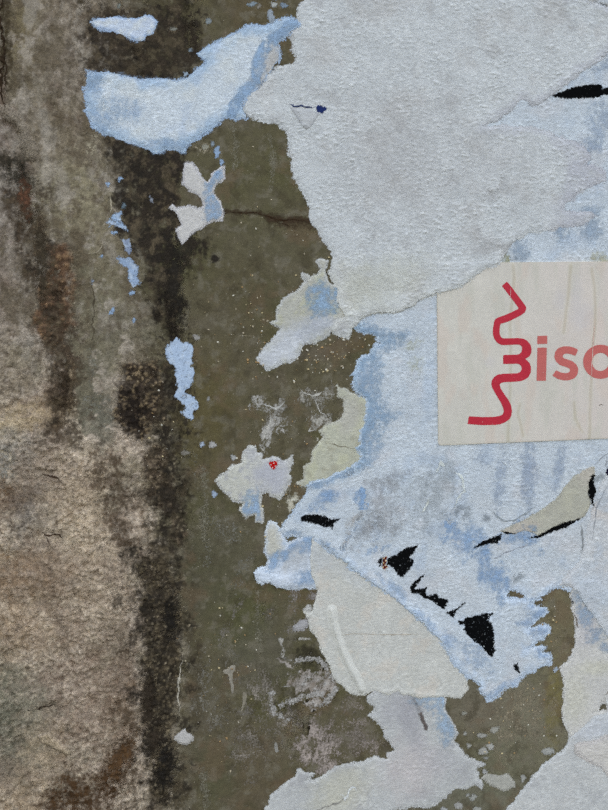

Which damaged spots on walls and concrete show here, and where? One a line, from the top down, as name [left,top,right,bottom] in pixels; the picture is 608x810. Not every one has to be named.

crack [0,0,8,106]
spalling [107,351,191,810]
water stain [0,134,379,810]
peeling [269,656,338,722]